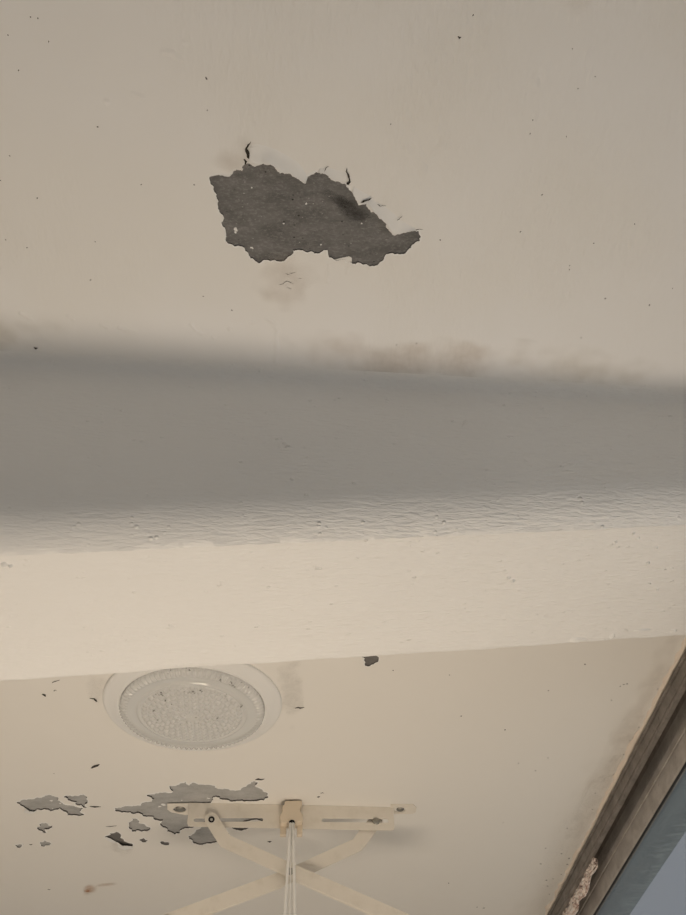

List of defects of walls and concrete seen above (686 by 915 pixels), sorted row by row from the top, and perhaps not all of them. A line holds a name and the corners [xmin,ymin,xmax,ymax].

peeling [208,142,423,267]
peeling [361,656,380,667]
peeling [16,794,99,816]
peeling [104,778,269,850]
peeling [14,822,53,848]